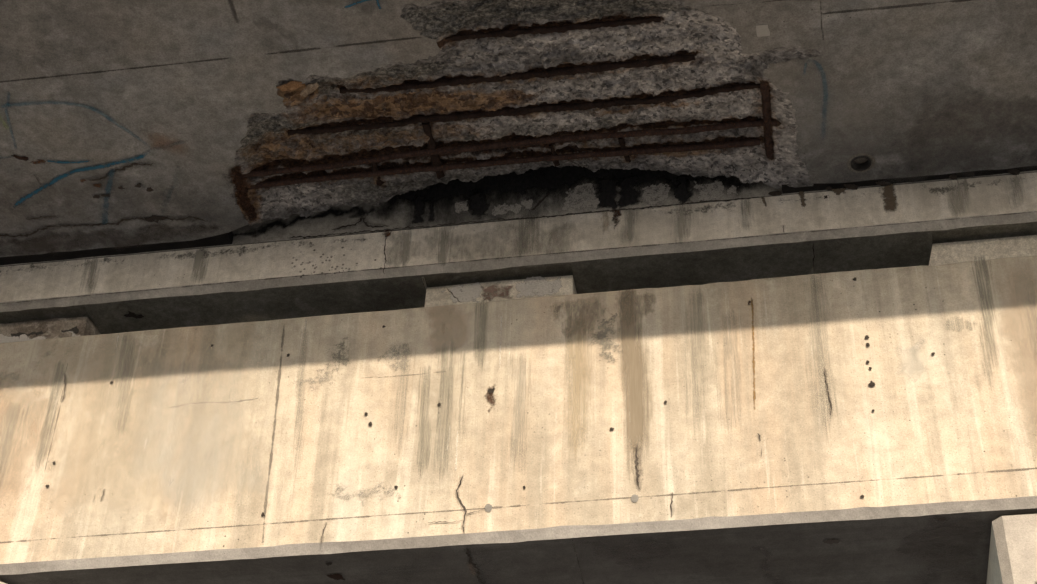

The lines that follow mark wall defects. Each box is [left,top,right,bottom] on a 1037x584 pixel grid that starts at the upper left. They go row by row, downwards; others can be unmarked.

spalling [231,0,824,226]
crack [0,163,206,237]
corrosion [228,167,254,217]
leakage [554,290,653,454]
corrosion [748,300,756,408]
crack [428,477,485,584]